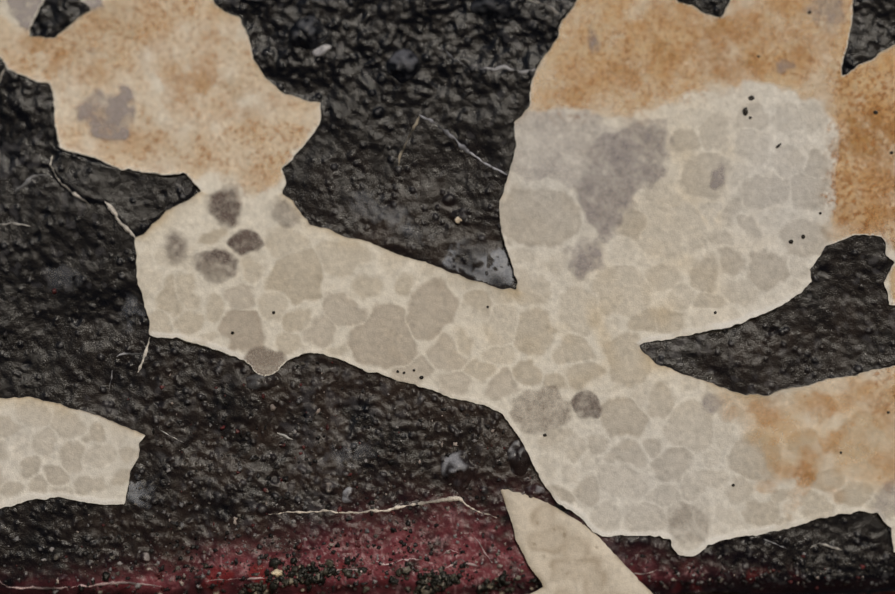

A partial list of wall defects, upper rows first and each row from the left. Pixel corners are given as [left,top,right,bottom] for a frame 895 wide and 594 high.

peeling [312,45,331,57]
water stain [79,86,134,139]
crack [398,115,507,175]
corrosion [831,52,895,229]
crack [16,156,135,238]
peeling [0,396,145,509]
crack [269,496,497,518]
crack [336,538,493,573]
peeling [501,489,653,594]